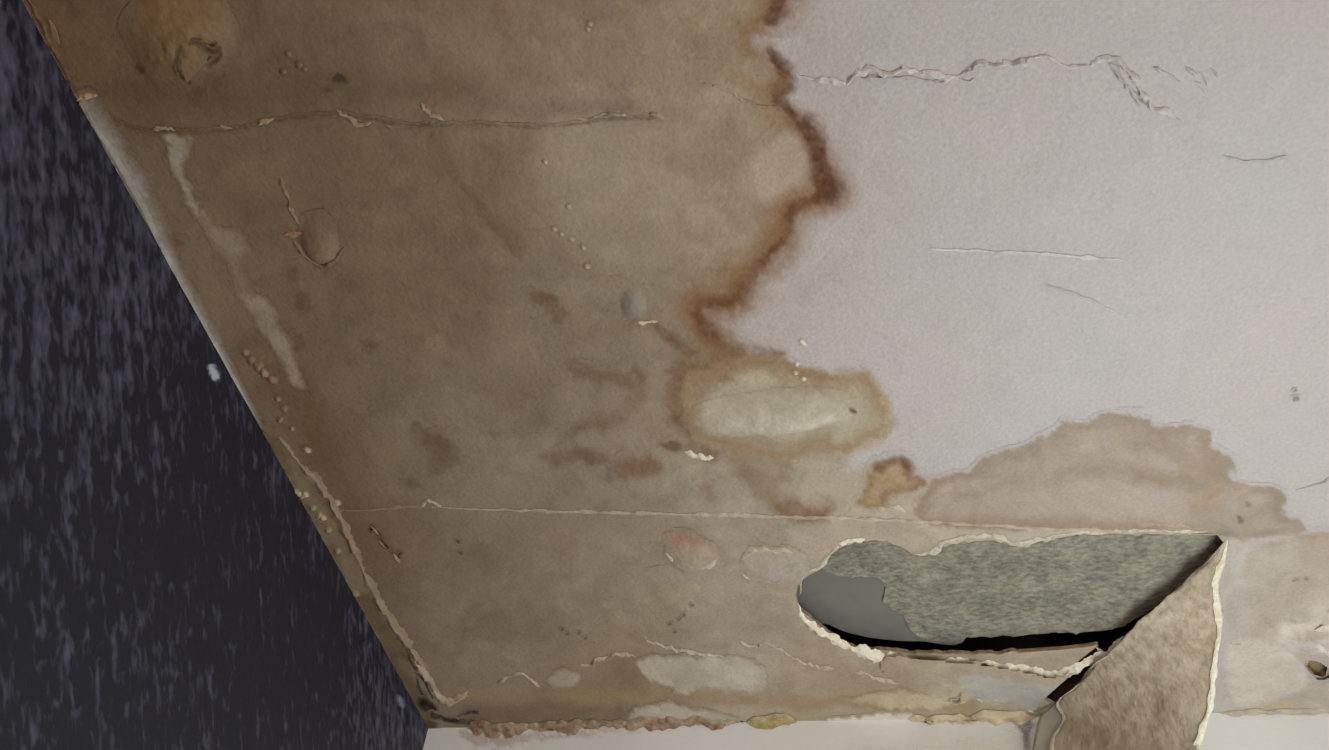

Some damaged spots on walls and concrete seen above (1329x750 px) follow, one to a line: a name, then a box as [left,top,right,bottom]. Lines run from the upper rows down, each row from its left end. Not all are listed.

crack [77,93,665,137]
crack [796,54,1218,123]
leakage [22,0,1103,724]
peeling [278,436,468,708]
leakage [910,407,1329,713]
peeling [825,688,1034,726]
hole [822,608,1154,702]
flaking render [1222,579,1329,717]